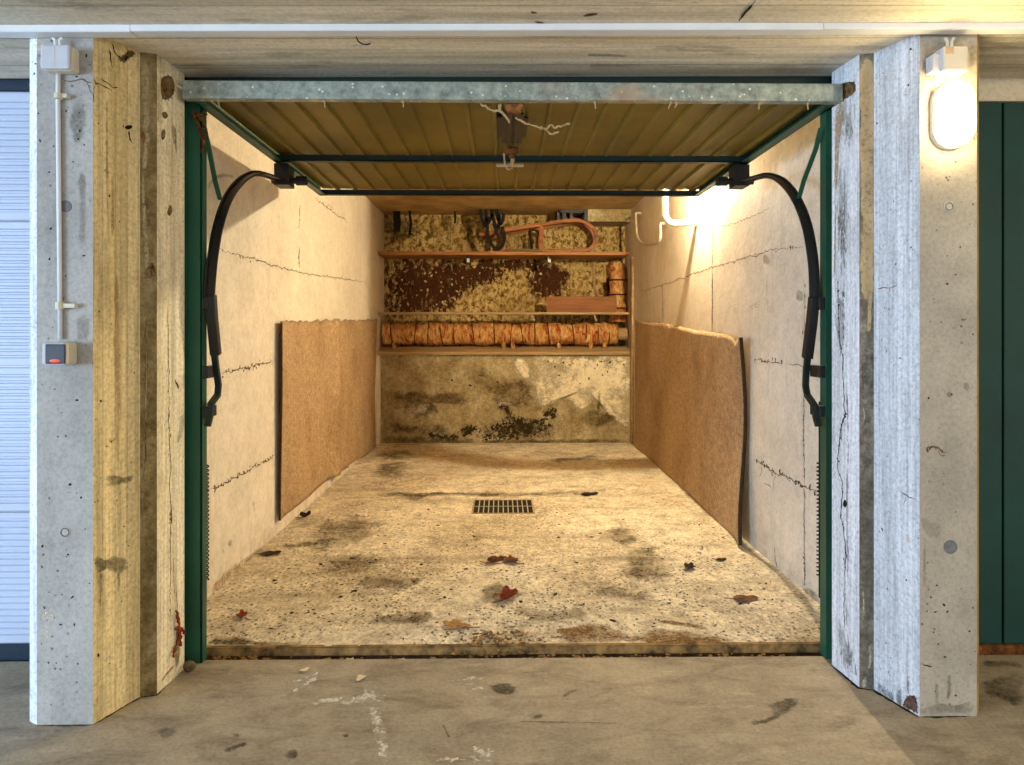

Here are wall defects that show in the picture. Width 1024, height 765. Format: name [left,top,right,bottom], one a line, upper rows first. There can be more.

leakage [377,380,615,476]
crack [837,281,847,628]